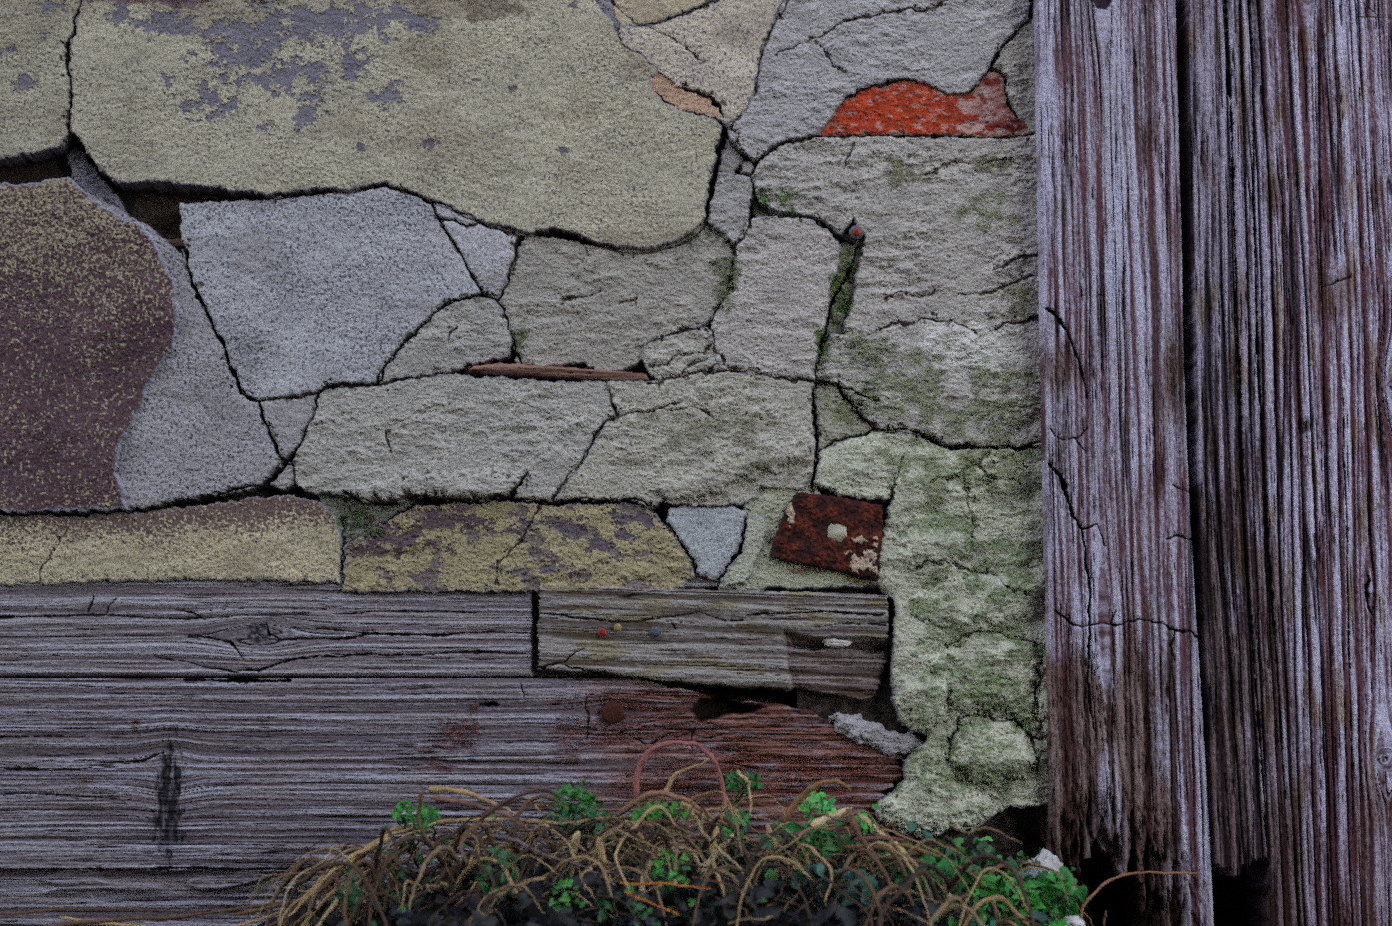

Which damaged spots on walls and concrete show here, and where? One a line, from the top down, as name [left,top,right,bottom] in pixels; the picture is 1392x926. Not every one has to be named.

peeling [10,74,39,92]
crack [64,0,82,143]
peeling [85,0,442,135]
spalling [820,72,1029,139]
spalling [0,141,206,254]
crack [136,0,1197,774]
crack [39,529,68,583]
rust [786,503,795,525]
rust [845,536,879,583]
crack [0,595,887,750]